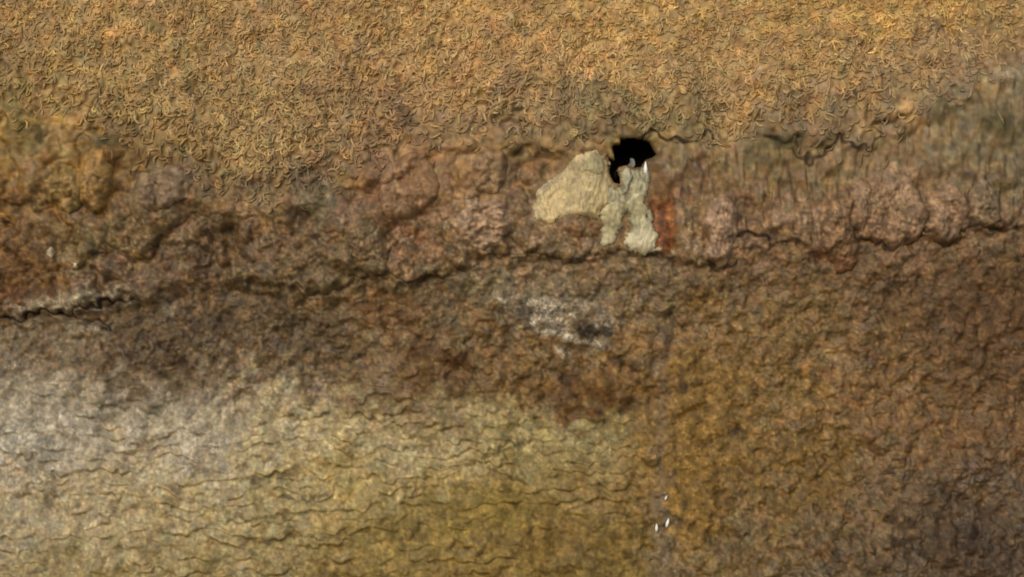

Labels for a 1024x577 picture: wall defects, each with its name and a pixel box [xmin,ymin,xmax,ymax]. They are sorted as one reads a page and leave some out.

peeling [532,150,659,256]
corrosion [652,186,676,253]
crack [737,231,785,246]
crack [855,231,925,251]
crack [0,298,133,331]